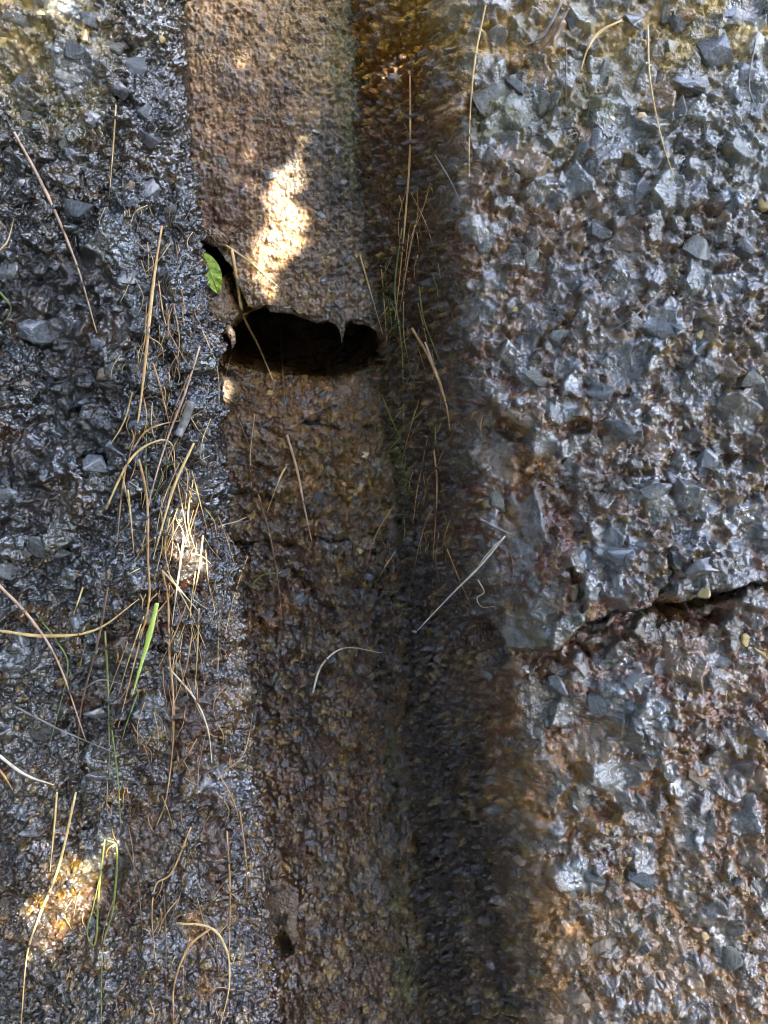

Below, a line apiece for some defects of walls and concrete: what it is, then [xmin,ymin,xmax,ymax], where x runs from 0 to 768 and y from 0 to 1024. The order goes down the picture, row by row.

crack [548,562,686,656]
crack [711,582,767,595]